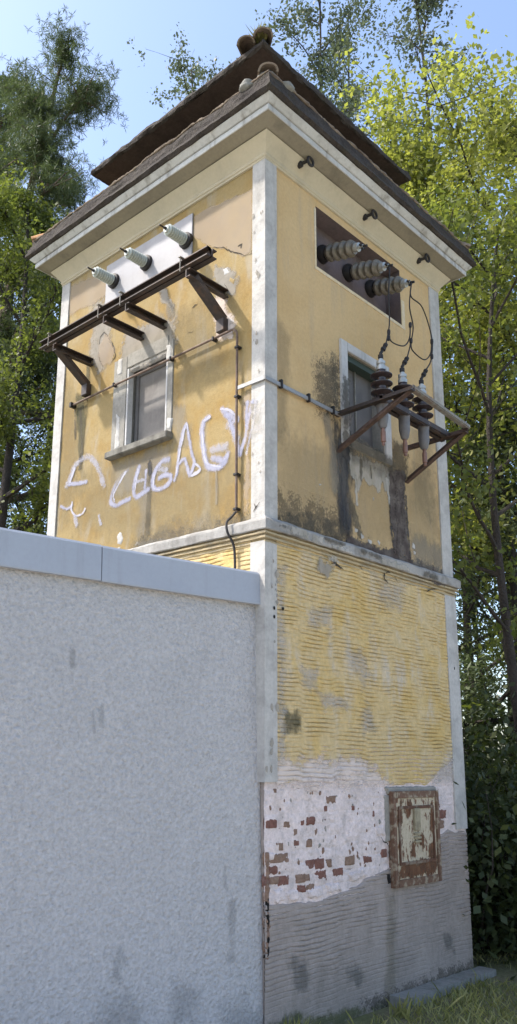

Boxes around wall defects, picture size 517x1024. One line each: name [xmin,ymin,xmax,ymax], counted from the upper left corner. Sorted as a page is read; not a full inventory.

water stain [324,413,411,561]
peeling [350,452,390,506]
flaking render [261,703,466,960]